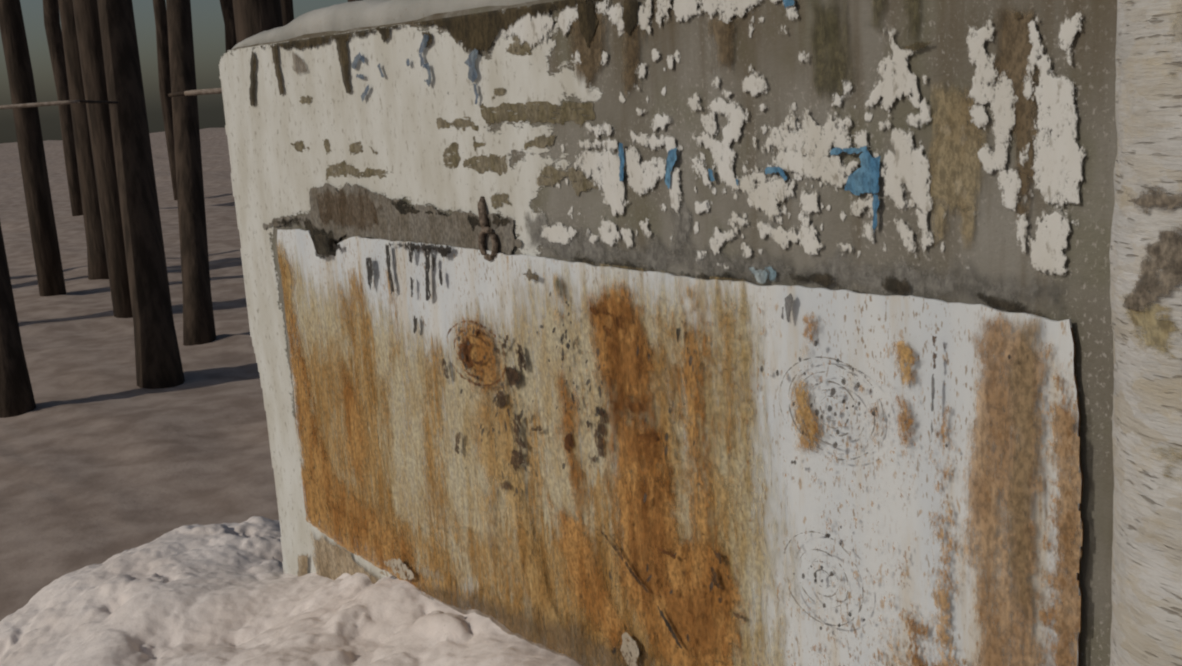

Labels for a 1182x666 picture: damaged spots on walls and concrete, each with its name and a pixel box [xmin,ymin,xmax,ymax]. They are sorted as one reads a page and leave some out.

peeling [219,0,946,580]
corrosion [278,244,1083,666]
peeling [966,12,1085,276]